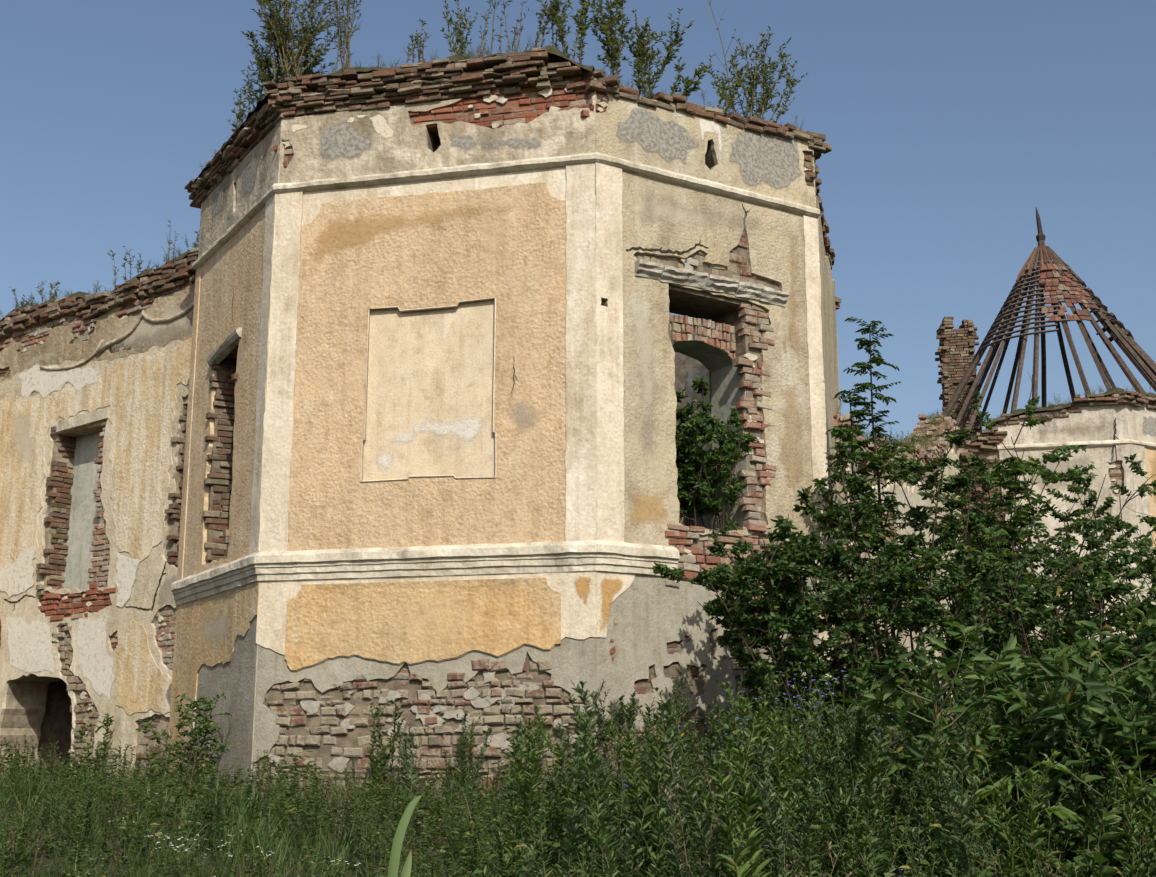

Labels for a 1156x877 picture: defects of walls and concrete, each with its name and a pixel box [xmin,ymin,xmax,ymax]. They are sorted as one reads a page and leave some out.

flaking render [409,78,608,131]
flaking render [638,228,776,284]
flaking render [72,316,100,342]
flaking render [110,296,185,353]
flaking render [0,325,99,411]
flaking render [665,301,783,599]
flaking render [0,547,140,782]
flaking render [155,605,176,669]
flaking render [260,582,769,801]